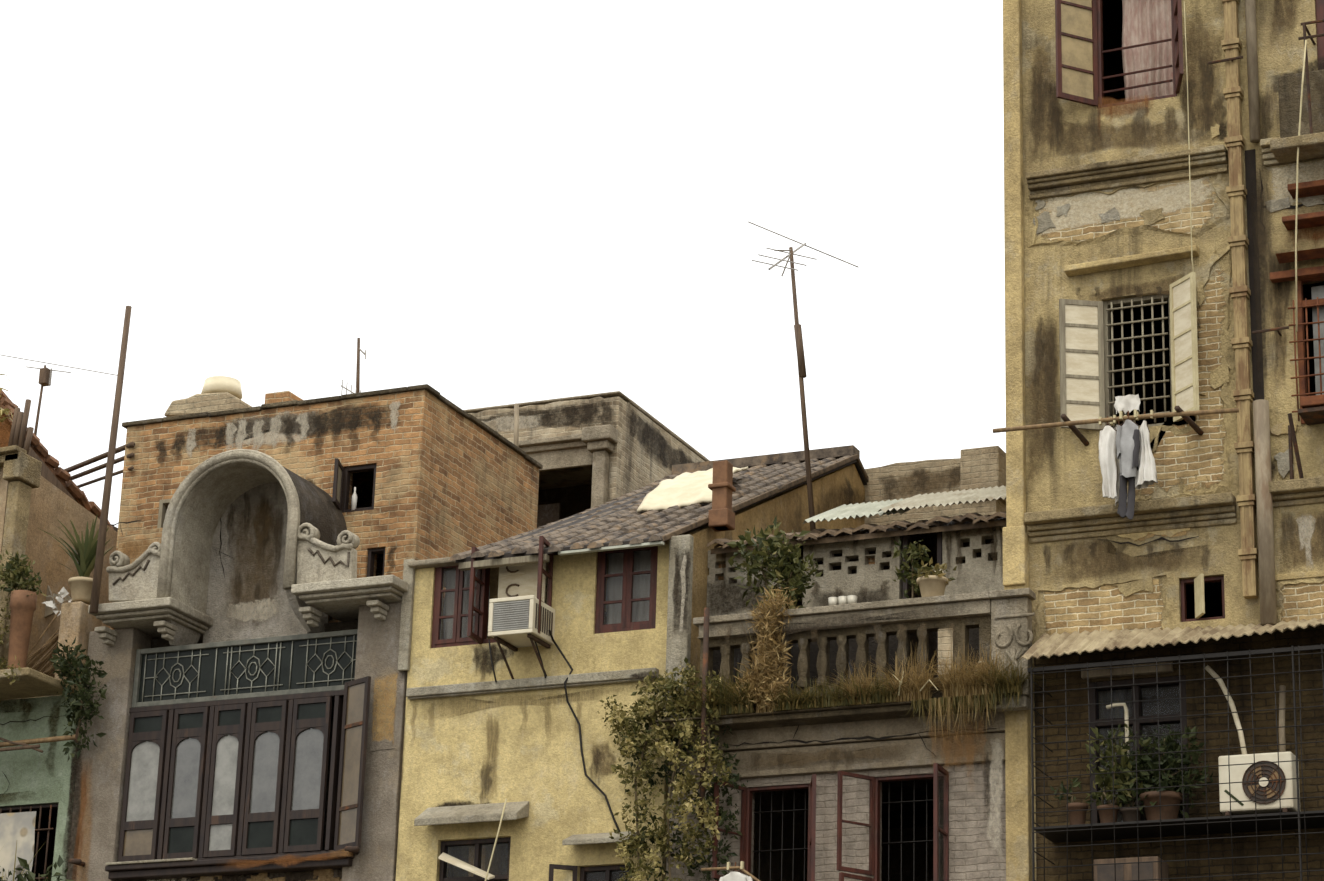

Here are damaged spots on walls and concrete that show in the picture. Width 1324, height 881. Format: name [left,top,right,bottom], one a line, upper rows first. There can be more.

damp [1032,19,1226,153]
flaking render [1026,173,1230,248]
flaking render [1127,245,1235,502]
damp [156,402,400,460]
flaking render [1031,571,1175,645]
damp [473,646,513,675]
spalling [247,872,285,881]
spalling [306,869,342,881]